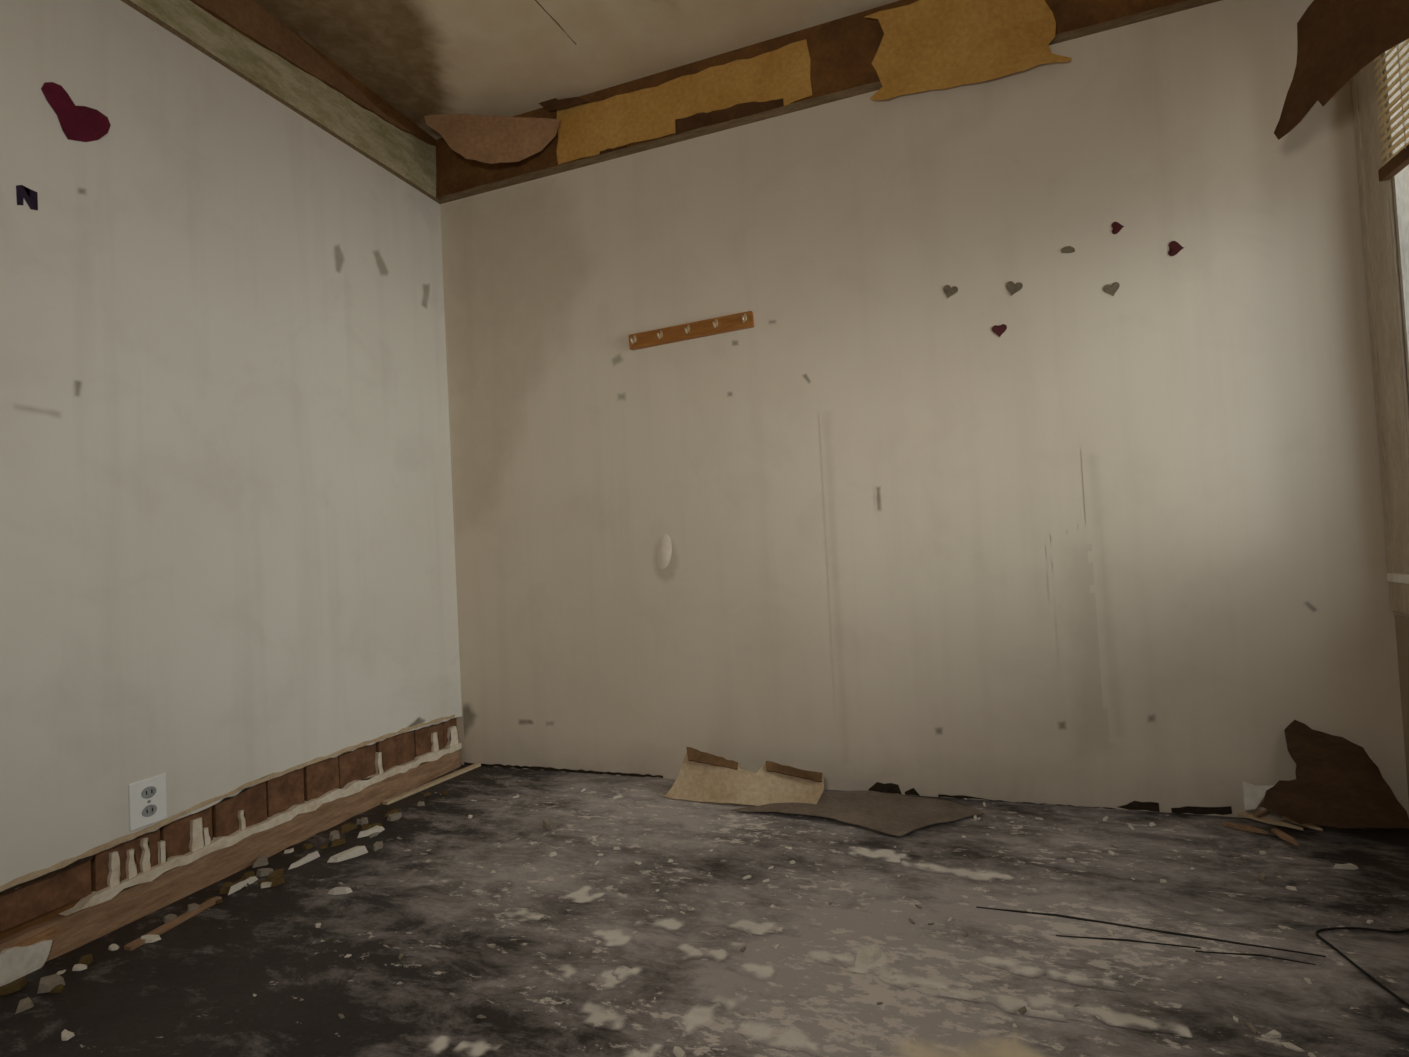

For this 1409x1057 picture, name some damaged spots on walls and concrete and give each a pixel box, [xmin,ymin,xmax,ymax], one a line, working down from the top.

peeling [539,97,588,111]
spalling [0,714,462,987]